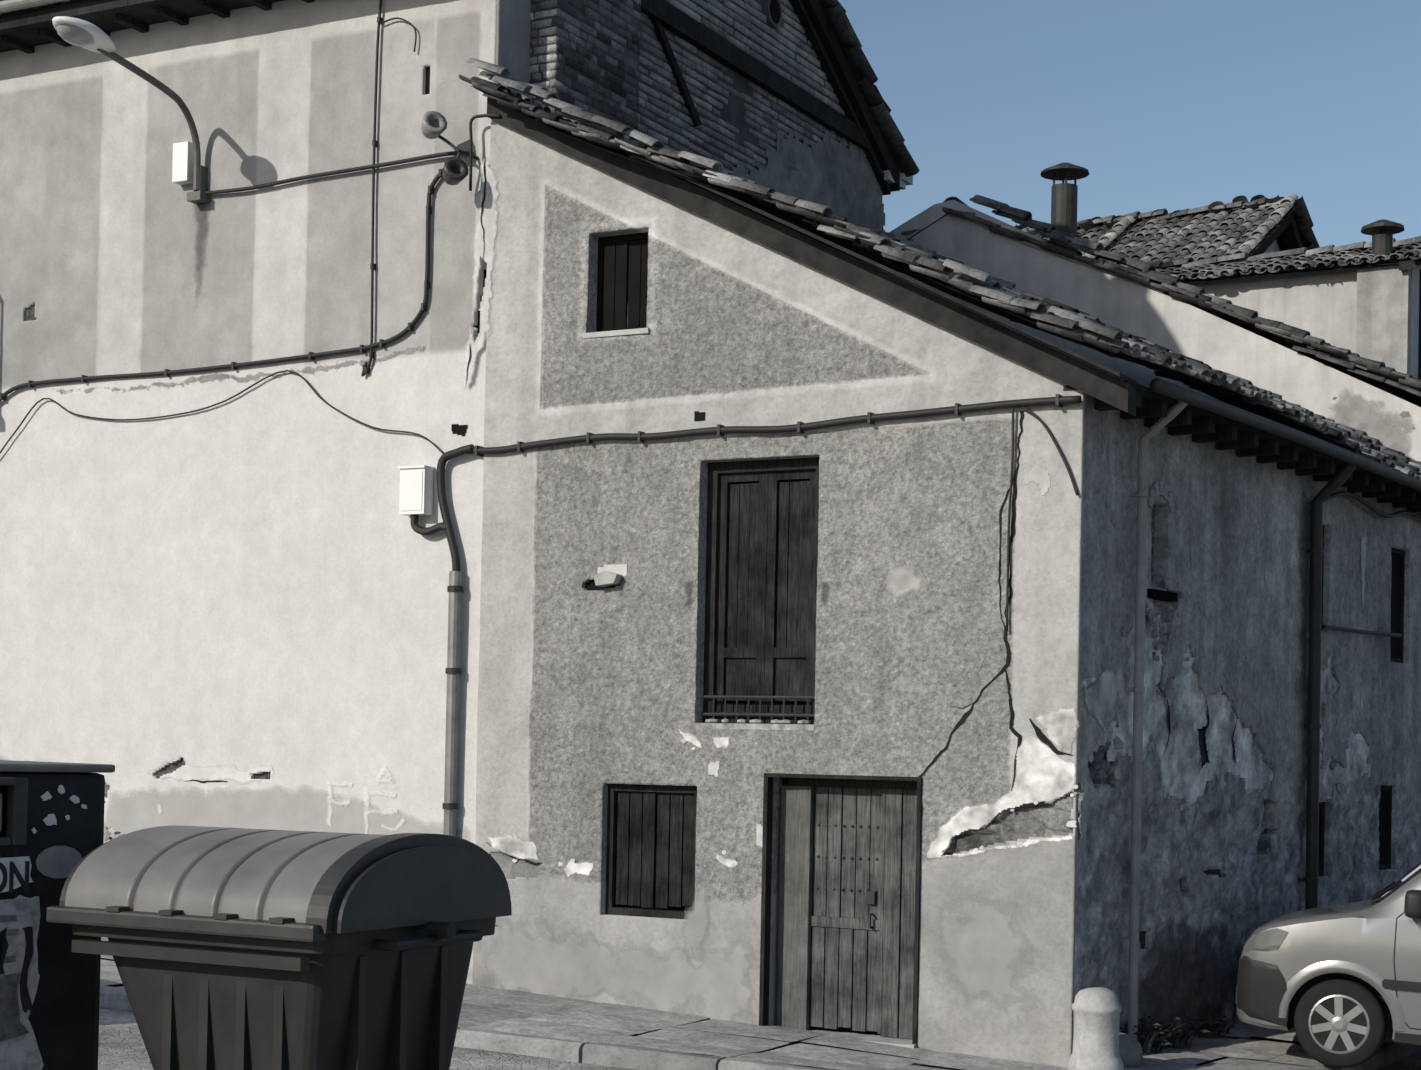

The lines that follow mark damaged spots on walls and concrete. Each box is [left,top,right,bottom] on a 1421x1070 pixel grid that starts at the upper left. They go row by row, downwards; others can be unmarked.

crack [918,411,1024,777]
spalling [104,827,124,843]
peeling [148,758,273,784]
peeling [486,834,593,880]
peeling [926,580,1281,858]
peeling [1319,654,1372,802]